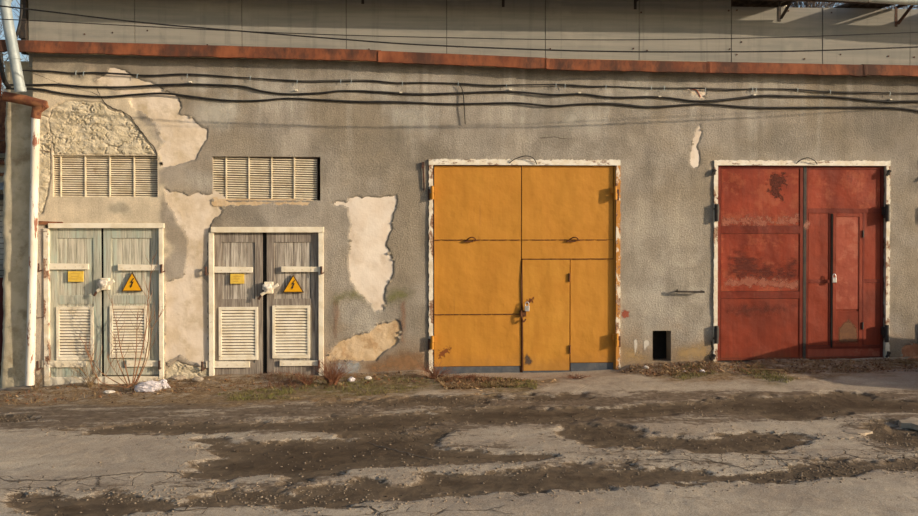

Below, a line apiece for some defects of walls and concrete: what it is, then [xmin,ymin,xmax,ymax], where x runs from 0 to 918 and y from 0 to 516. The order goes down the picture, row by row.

spalling [38,68,207,214]
peeling [690,125,703,168]
rust [767,172,788,201]
peeling [334,195,397,311]
rust [730,256,797,281]
spalling [327,320,402,361]
rust [839,320,857,342]